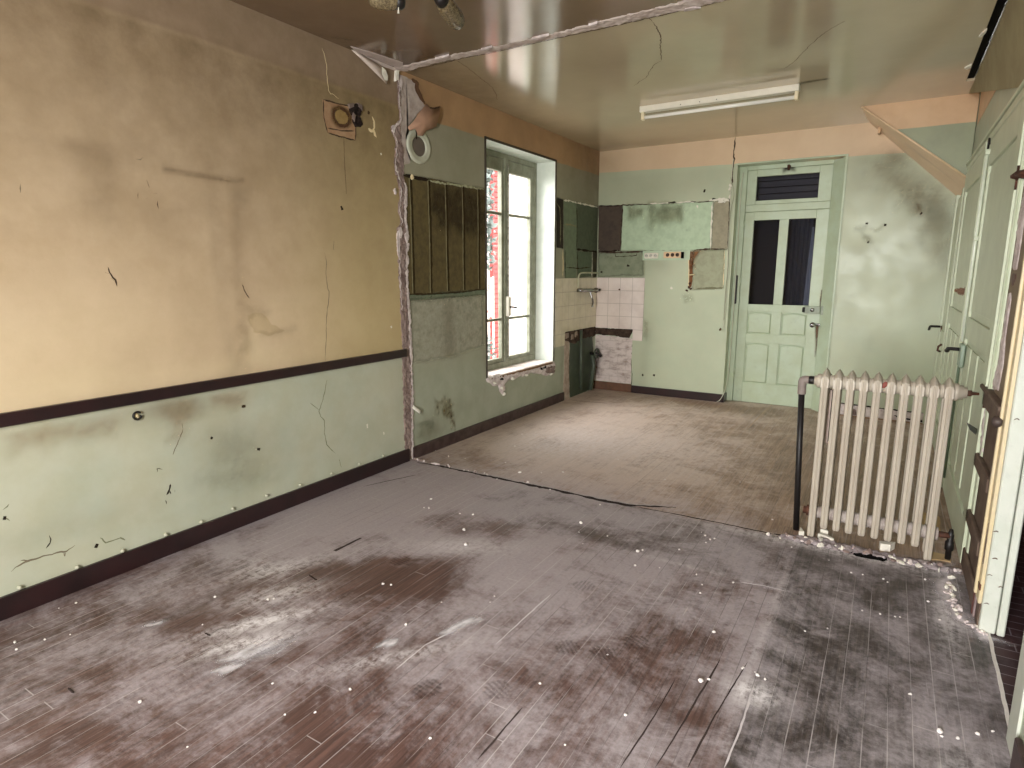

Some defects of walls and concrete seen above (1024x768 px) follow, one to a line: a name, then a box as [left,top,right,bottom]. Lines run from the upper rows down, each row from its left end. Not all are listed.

crack [634,18,662,86]
flaking render [391,75,425,165]
peeling [393,182,409,257]
flaking render [486,327,655,399]
crack [312,382,341,465]
crack [11,536,75,572]